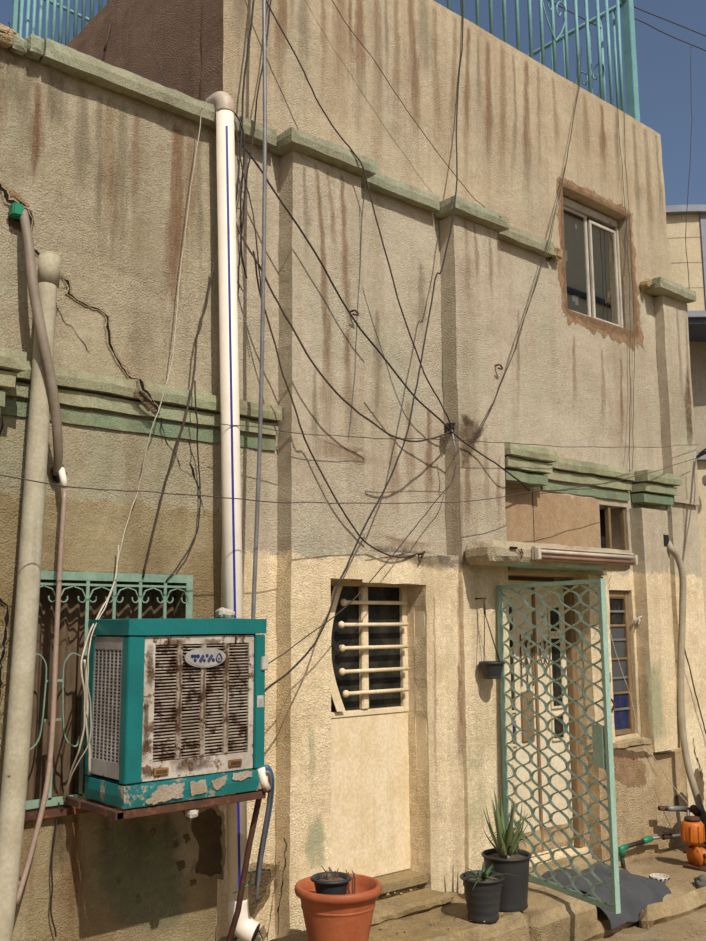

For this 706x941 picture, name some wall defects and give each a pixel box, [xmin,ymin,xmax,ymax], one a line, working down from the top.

crack [0,179,41,259]
peeling [541,176,652,351]
crack [56,274,205,513]
crack [0,595,11,746]
flaking render [613,748,652,788]
flaking render [173,806,226,886]